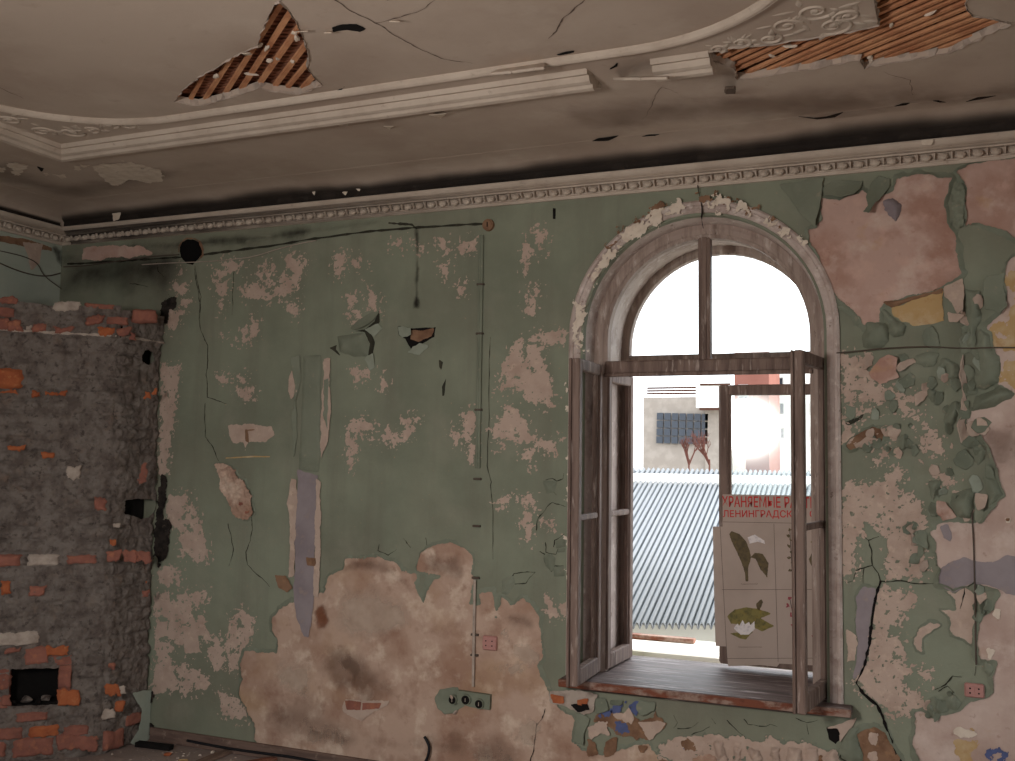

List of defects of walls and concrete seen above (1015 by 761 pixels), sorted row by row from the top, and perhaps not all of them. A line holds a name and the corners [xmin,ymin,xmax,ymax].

flaking render [174,1,322,106]
crack [335,0,460,62]
crack [549,0,585,38]
flaking render [709,0,1011,80]
peeling [587,198,685,288]
peeling [206,247,317,350]
peeling [444,222,589,473]
peeling [157,360,183,480]
flaking render [214,424,274,522]
flaking render [763,157,1015,761]
flaking render [148,479,673,761]
crack [847,536,934,761]